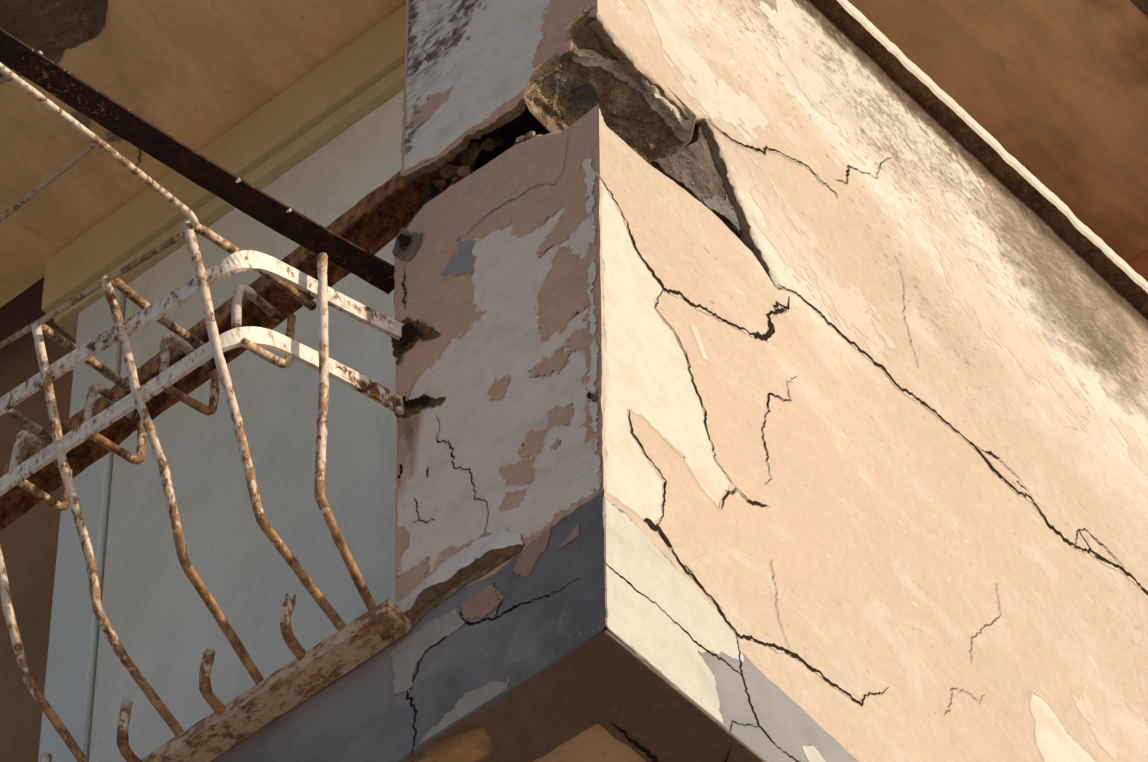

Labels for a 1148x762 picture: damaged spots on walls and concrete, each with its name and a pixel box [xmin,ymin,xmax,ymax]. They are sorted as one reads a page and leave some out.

peeling [0,0,108,63]
peeling [403,0,897,378]
crack [709,119,892,198]
crack [397,416,489,536]
peeling [389,148,744,725]
crack [596,170,1148,594]
peeling [419,678,510,746]
crack [406,577,580,762]
crack [603,414,889,762]
crack [945,687,985,714]
crack [970,583,1002,663]
peeling [1028,689,1121,762]